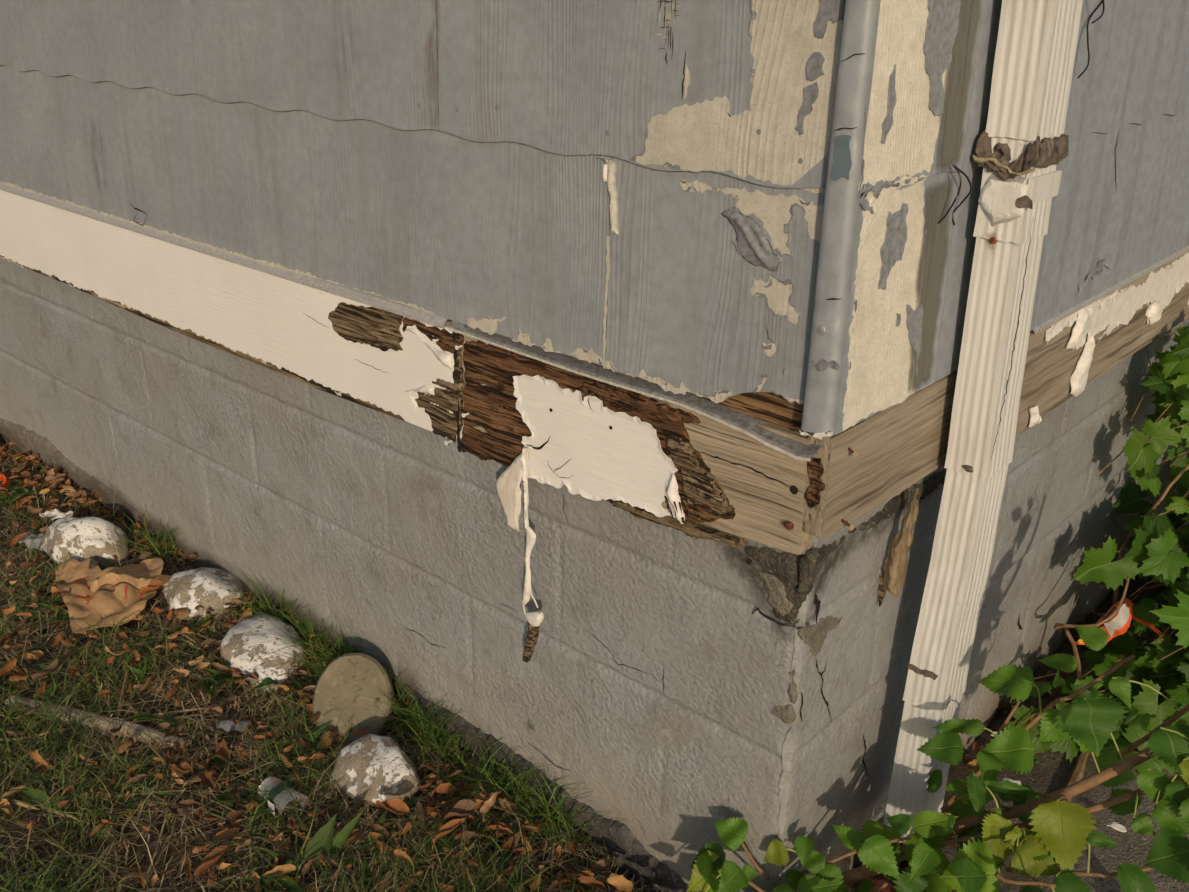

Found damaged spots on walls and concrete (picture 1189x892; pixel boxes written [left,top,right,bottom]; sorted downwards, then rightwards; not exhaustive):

peeling [631,0,961,439]
peeling [406,328,453,370]
peeling [467,316,507,335]
peeling [511,329,733,404]
peeling [1045,252,1189,397]
peeling [495,374,685,663]
spalling [744,468,947,657]
crack [752,594,843,644]
spalling [771,669,798,724]
crack [800,660,831,722]
crack [861,735,869,775]